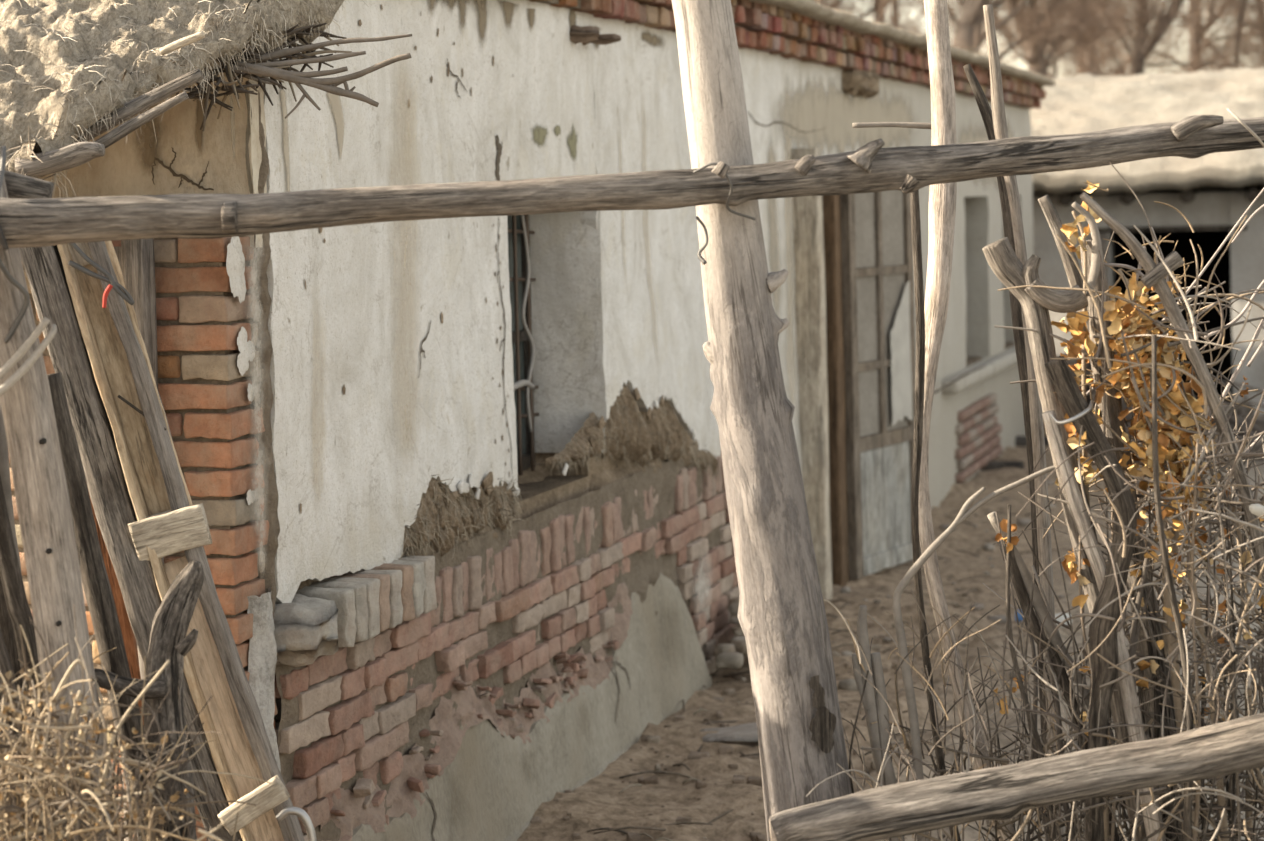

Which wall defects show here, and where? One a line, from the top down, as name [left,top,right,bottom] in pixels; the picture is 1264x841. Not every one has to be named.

water stain [428,0,535,40]
water stain [642,32,662,46]
peeling [533,125,577,159]
crack [151,148,214,191]
peeling [238,274,246,303]
peeling [237,326,256,401]
spalling [538,385,722,486]
peeling [247,490,258,505]
spalling [396,471,526,564]
spalling [320,582,633,841]